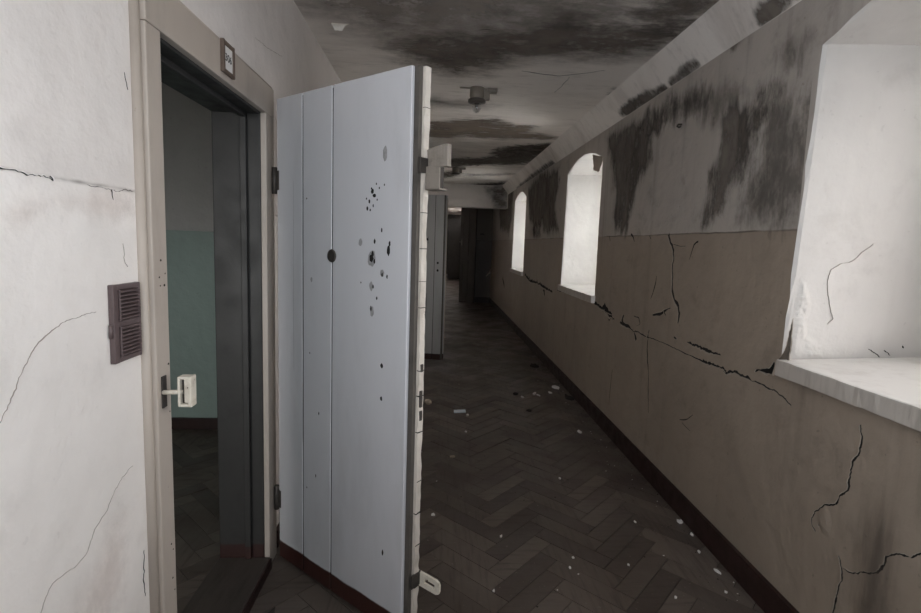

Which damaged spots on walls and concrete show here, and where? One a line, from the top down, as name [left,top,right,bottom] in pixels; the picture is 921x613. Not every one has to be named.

leakage [755,0,791,25]
crack [0,166,55,181]
leakage [429,119,556,178]
leakage [473,161,560,235]
leakage [609,61,706,233]
leakage [703,103,806,226]
crack [0,312,95,423]
crack [592,233,791,413]
peeling [754,277,824,376]
crack [827,244,874,324]
crack [810,425,863,532]
crack [831,552,921,613]